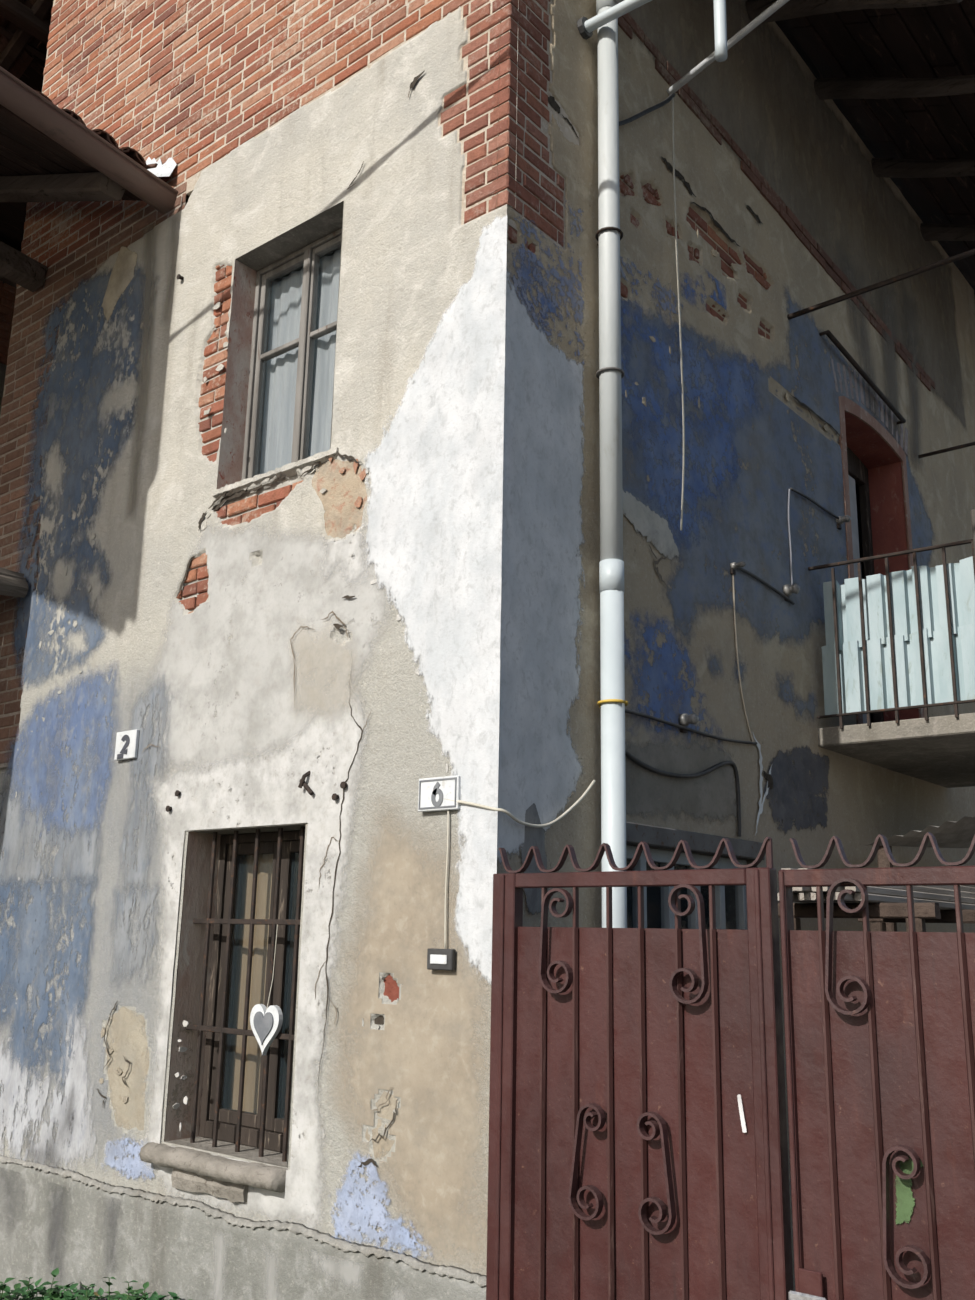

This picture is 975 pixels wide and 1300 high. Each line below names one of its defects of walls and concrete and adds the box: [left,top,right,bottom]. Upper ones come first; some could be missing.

flaking render [548,96,578,137]
flaking render [619,174,661,206]
peeling [0,266,145,1086]
flaking render [176,553,209,614]
peeling [97,682,432,1257]
flaking render [198,265,369,538]
crack [315,652,371,1085]
peeling [620,202,933,743]
peeling [764,745,829,834]